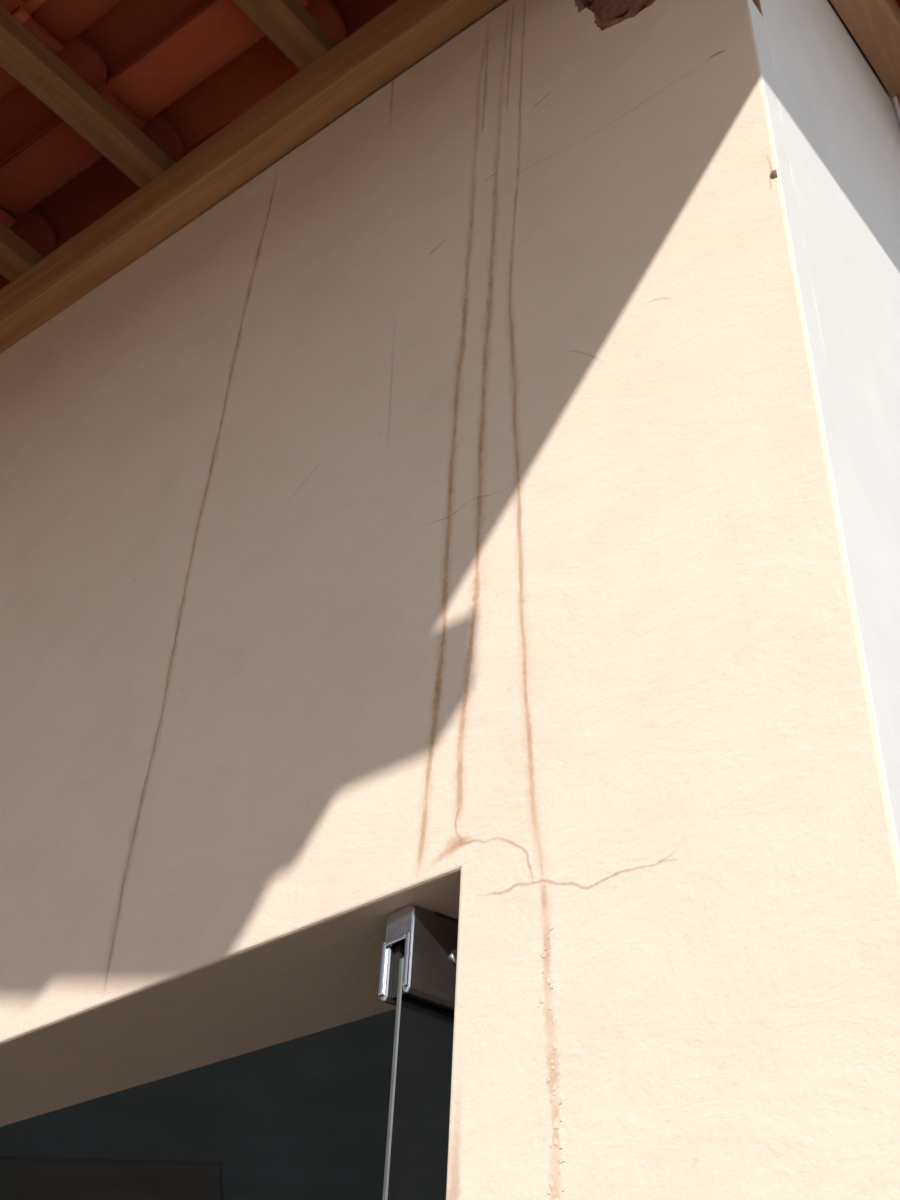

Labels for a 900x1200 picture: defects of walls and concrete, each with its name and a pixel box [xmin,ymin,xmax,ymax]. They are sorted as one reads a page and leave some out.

spalling [587,0,656,31]